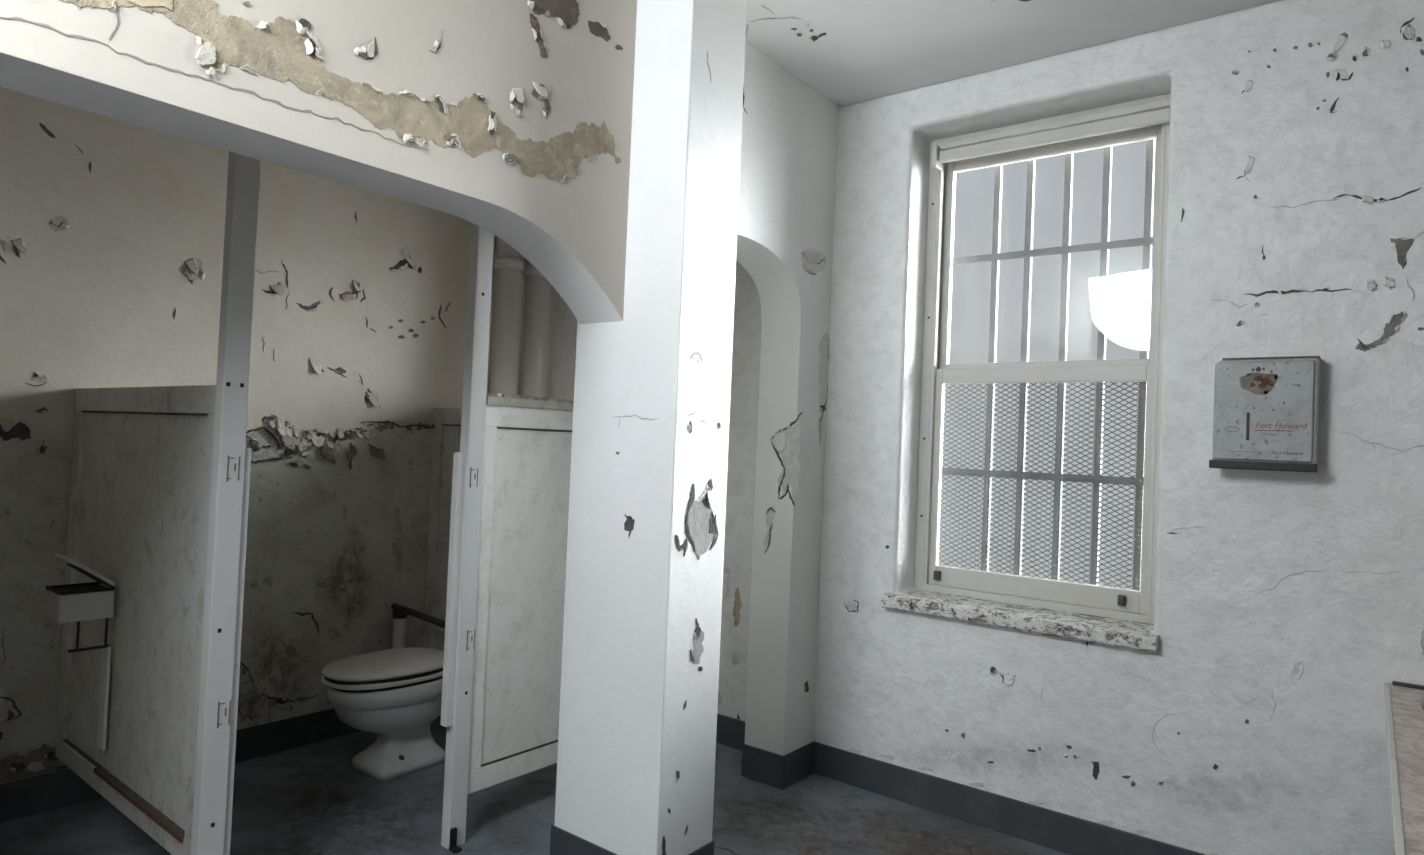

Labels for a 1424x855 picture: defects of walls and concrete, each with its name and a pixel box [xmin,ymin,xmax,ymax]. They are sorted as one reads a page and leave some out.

flaking render [60,0,623,183]
peeling [1267,18,1424,113]
crack [1271,182,1424,208]
peeling [0,238,28,264]
peeling [255,260,450,338]
peeling [389,248,423,274]
crack [1212,286,1363,308]
peeling [0,406,50,453]
peeling [245,357,435,470]
peeling [818,333,829,446]
peeling [676,479,718,560]
peeling [763,412,802,553]